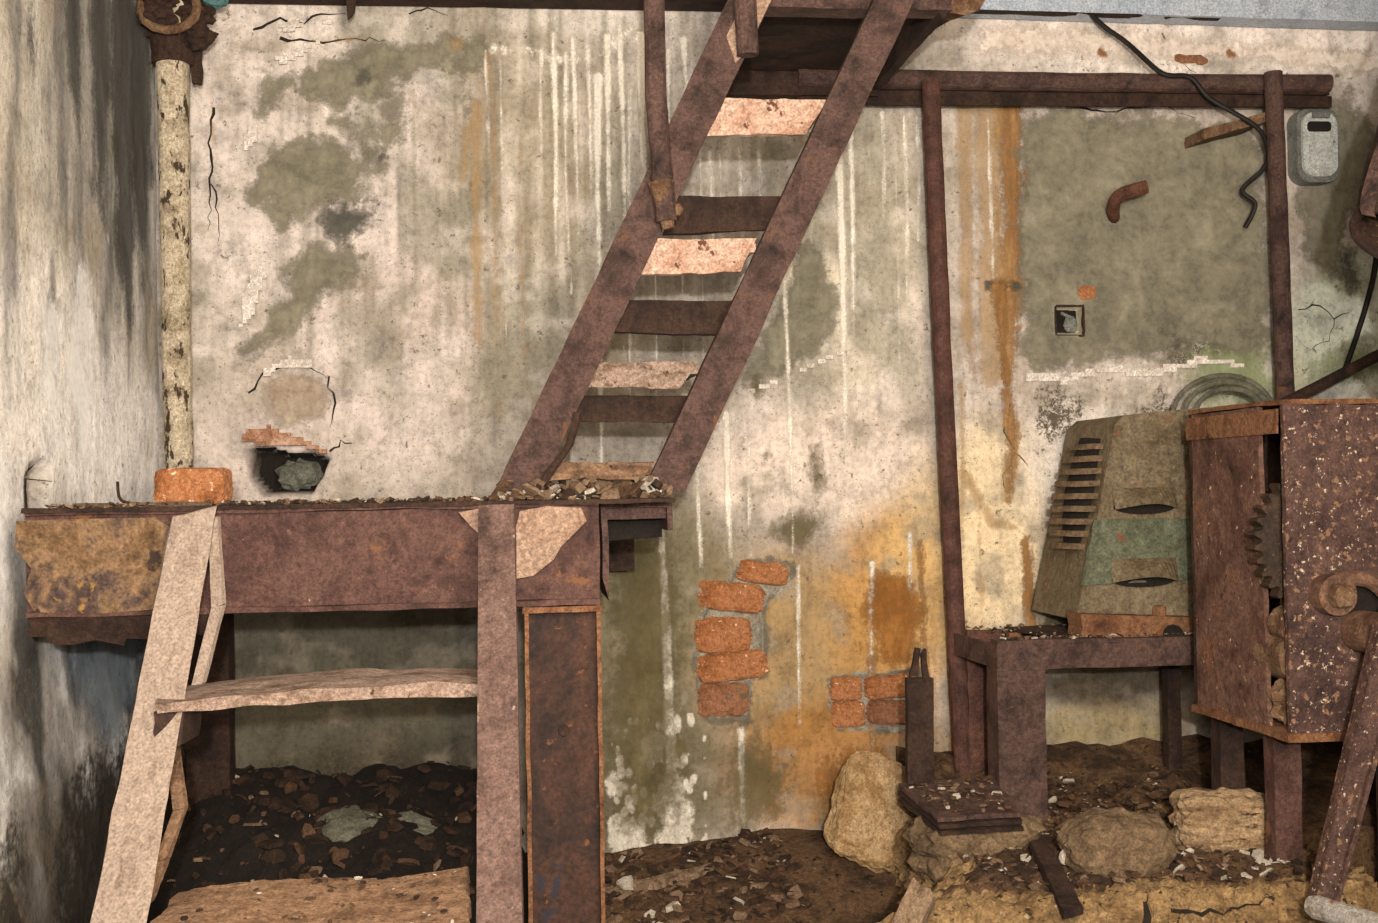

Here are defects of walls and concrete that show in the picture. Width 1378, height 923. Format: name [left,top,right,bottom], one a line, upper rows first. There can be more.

leakage [66,0,153,339]
leakage [484,17,647,269]
leakage [666,36,688,123]
leakage [42,266,93,456]
peeling [263,356,312,376]
corrosion [958,106,1028,502]
leakage [608,537,686,835]
flaking render [693,556,797,726]
flaking render [828,667,922,734]
corrosion [861,532,930,677]
corrosion [962,473,1036,626]
crack [1143,895,1274,923]